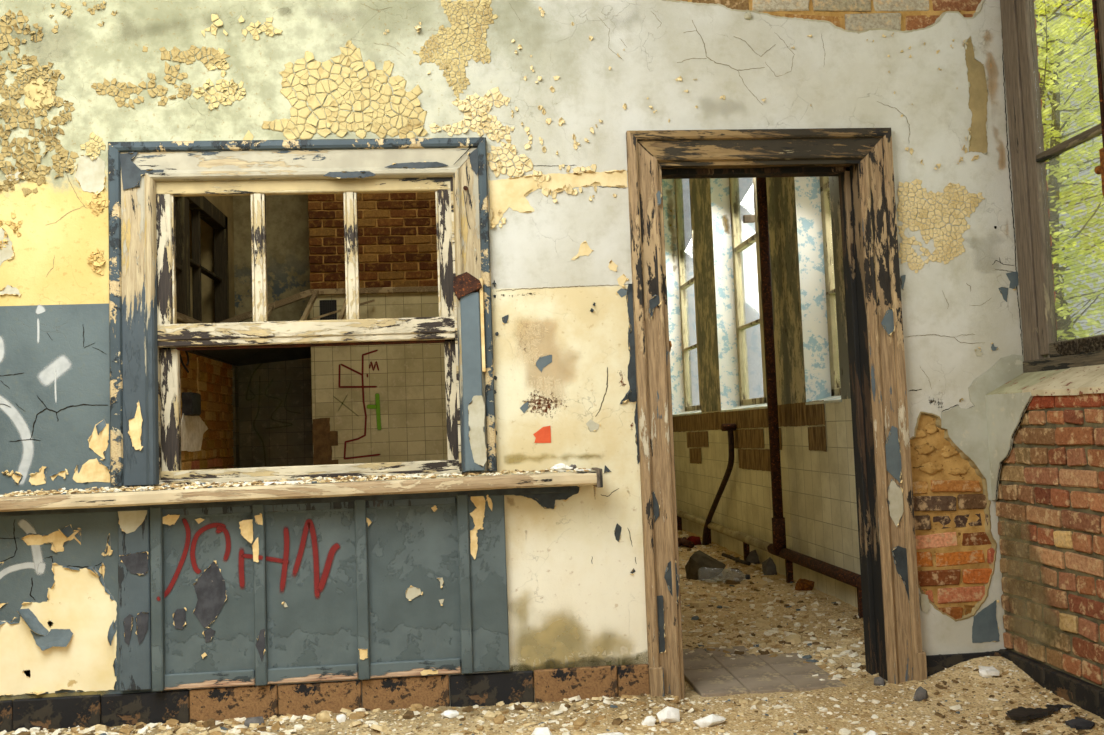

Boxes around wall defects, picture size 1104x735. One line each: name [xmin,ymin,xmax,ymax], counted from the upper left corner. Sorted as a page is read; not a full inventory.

peeling [0,1,117,216]
peeling [91,14,246,110]
peeling [238,0,627,229]
crack [653,13,794,105]
spalling [663,0,985,45]
flaking render [936,35,988,165]
peeling [120,152,164,190]
peeling [897,179,985,273]
peeling [163,514,180,526]
spalling [885,412,999,622]
peeling [0,510,149,696]
water stain [506,617,648,683]